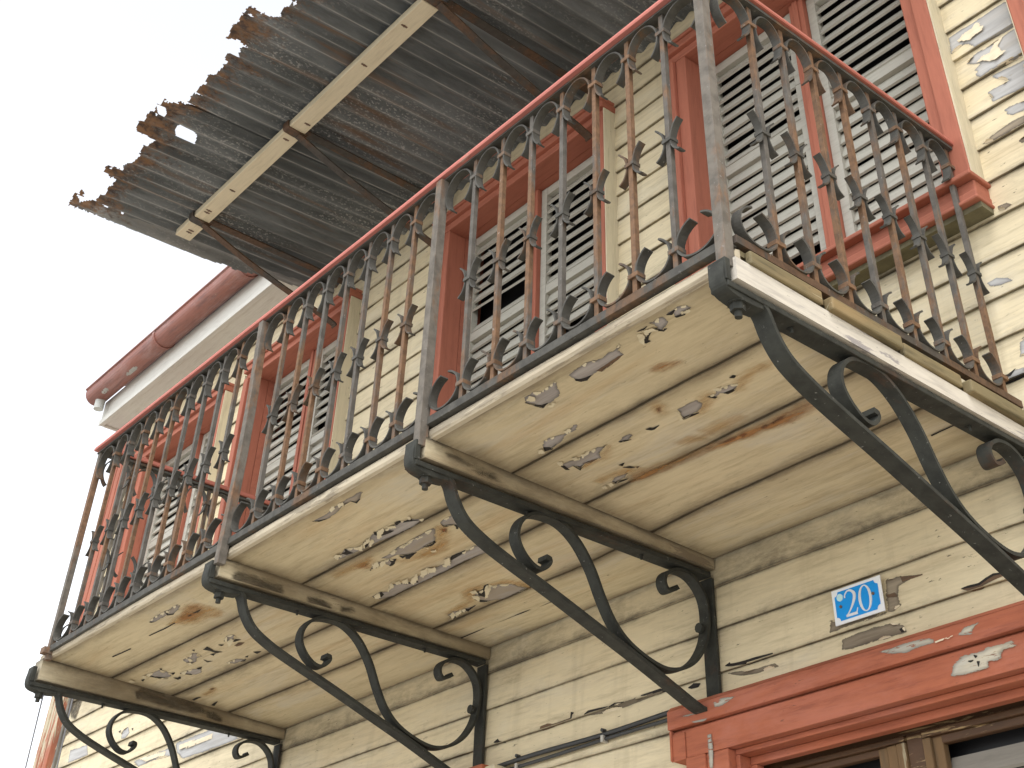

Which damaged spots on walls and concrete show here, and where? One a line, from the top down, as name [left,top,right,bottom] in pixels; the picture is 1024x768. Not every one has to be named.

peeling [949,2,1024,144]
peeling [568,345,624,382]
peeling [525,382,560,408]
peeling [676,375,738,421]
corrosion [714,404,809,448]
peeling [557,446,606,470]
corrosion [625,457,687,480]
peeling [333,516,485,599]
peeling [448,584,527,619]
peeling [830,574,978,654]
peeling [128,635,248,683]
peeling [951,641,1016,676]